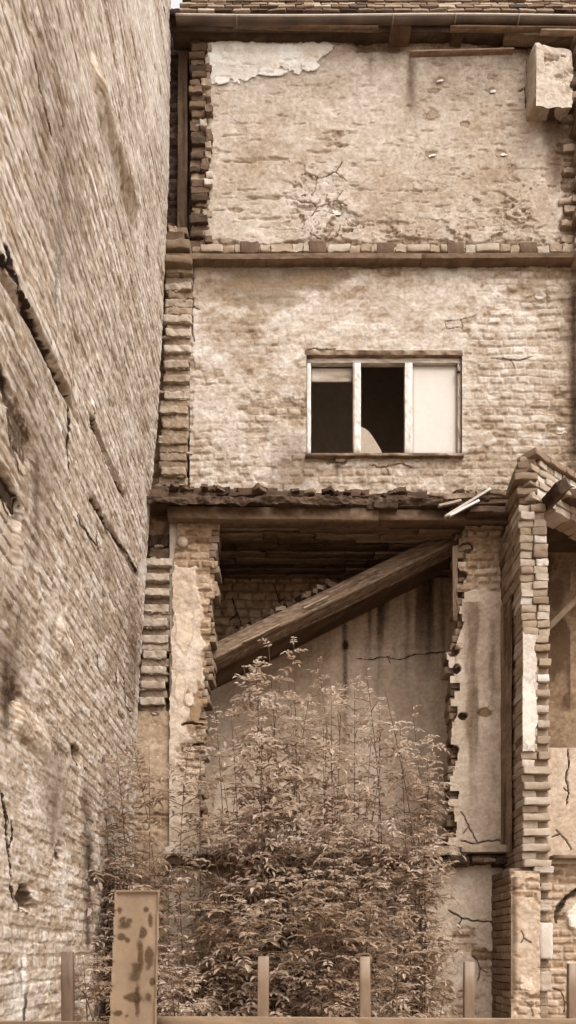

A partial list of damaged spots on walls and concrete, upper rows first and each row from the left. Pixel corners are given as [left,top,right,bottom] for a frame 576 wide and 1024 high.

flaking render [208,41,333,84]
crack [299,162,348,242]
crack [77,499,137,574]
crack [358,651,447,664]
spalling [449,643,464,674]
water stain [467,603,479,739]
crack [562,750,570,804]
crack [0,792,14,899]
crack [461,812,500,844]
spalling [14,886,32,913]
flaking render [565,903,576,928]